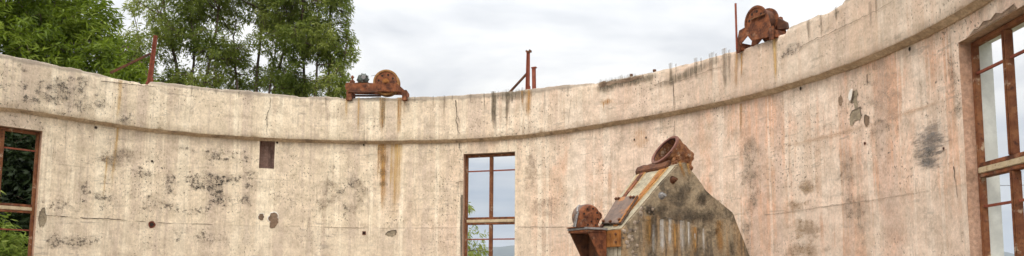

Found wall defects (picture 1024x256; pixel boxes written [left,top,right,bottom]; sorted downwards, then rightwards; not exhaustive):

leakage [600,74,653,91]
leakage [670,60,702,83]
spalling [838,89,869,126]
corrosion [378,144,400,194]
leakage [137,147,258,216]
spalling [38,207,47,227]
spalling [258,211,279,228]
leakage [46,233,101,247]